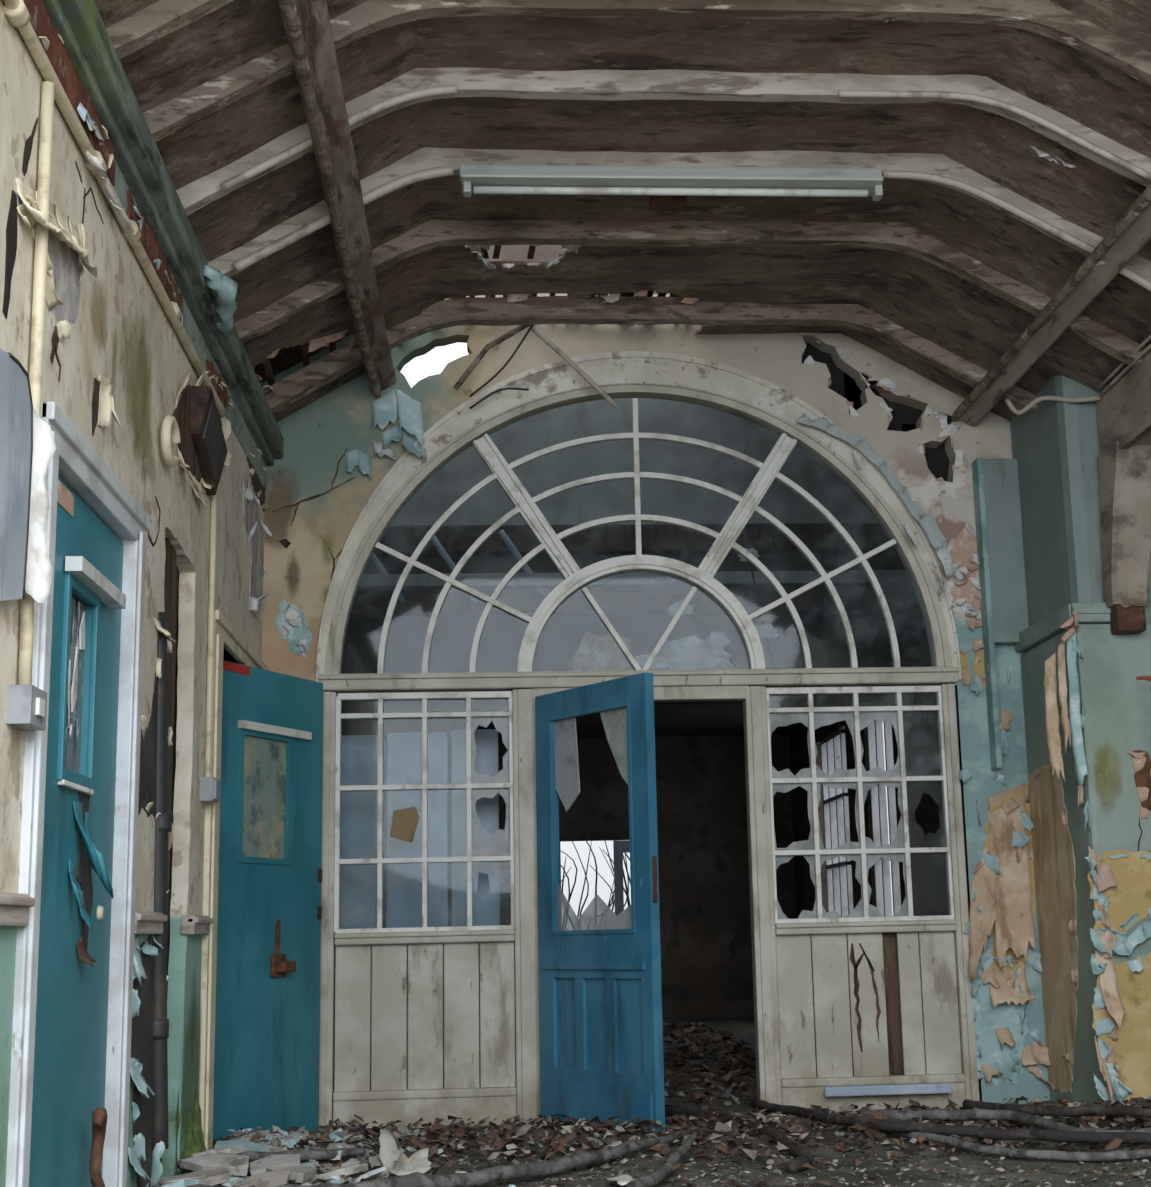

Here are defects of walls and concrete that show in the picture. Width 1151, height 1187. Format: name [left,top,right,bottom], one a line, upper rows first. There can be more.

flaking render [14,178,97,340]
flaking render [22,0,184,325]
spalling [160,360,234,508]
spalling [802,340,963,482]
peeling [796,413,1013,696]
flaking render [963,610,1151,1103]
flaking render [128,934,169,1187]